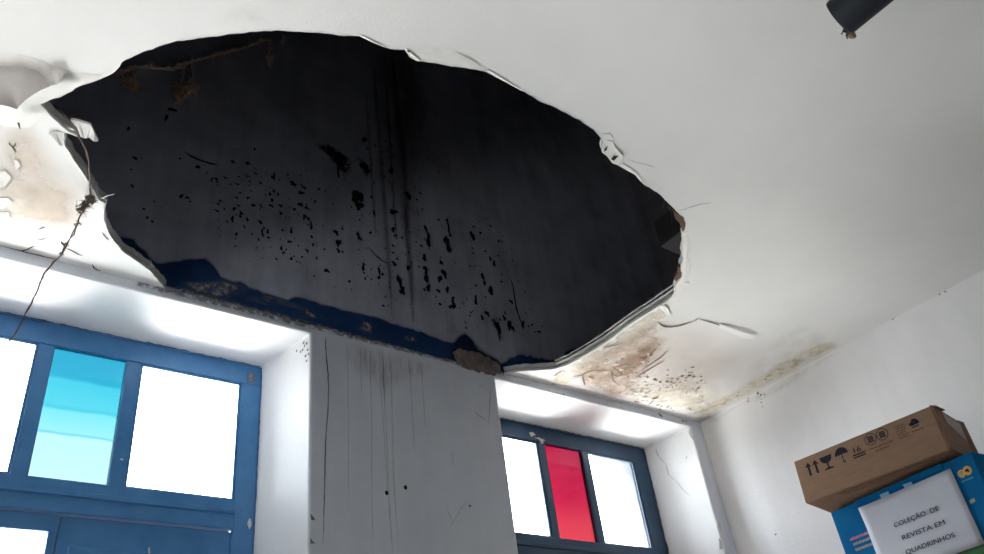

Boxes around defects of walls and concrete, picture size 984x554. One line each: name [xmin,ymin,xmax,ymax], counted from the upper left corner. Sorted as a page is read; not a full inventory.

crack [4,227,100,271]
spalling [42,28,691,376]
crack [322,338,330,538]
water stain [573,315,729,422]